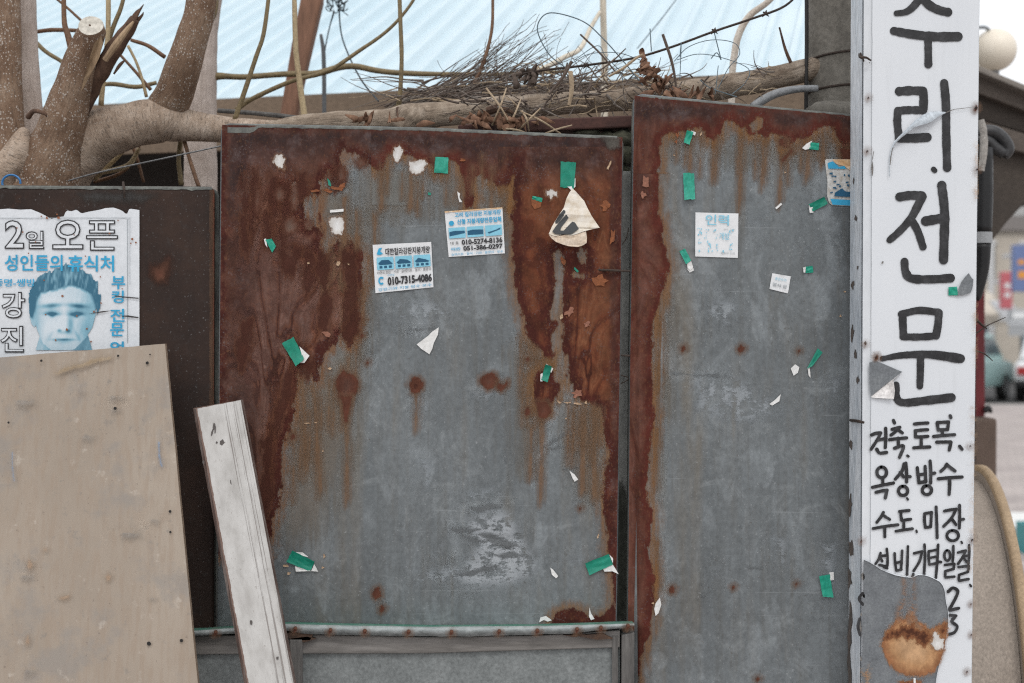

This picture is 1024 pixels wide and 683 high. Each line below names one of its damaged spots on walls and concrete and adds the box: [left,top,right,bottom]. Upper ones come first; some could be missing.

rust [211,96,850,683]